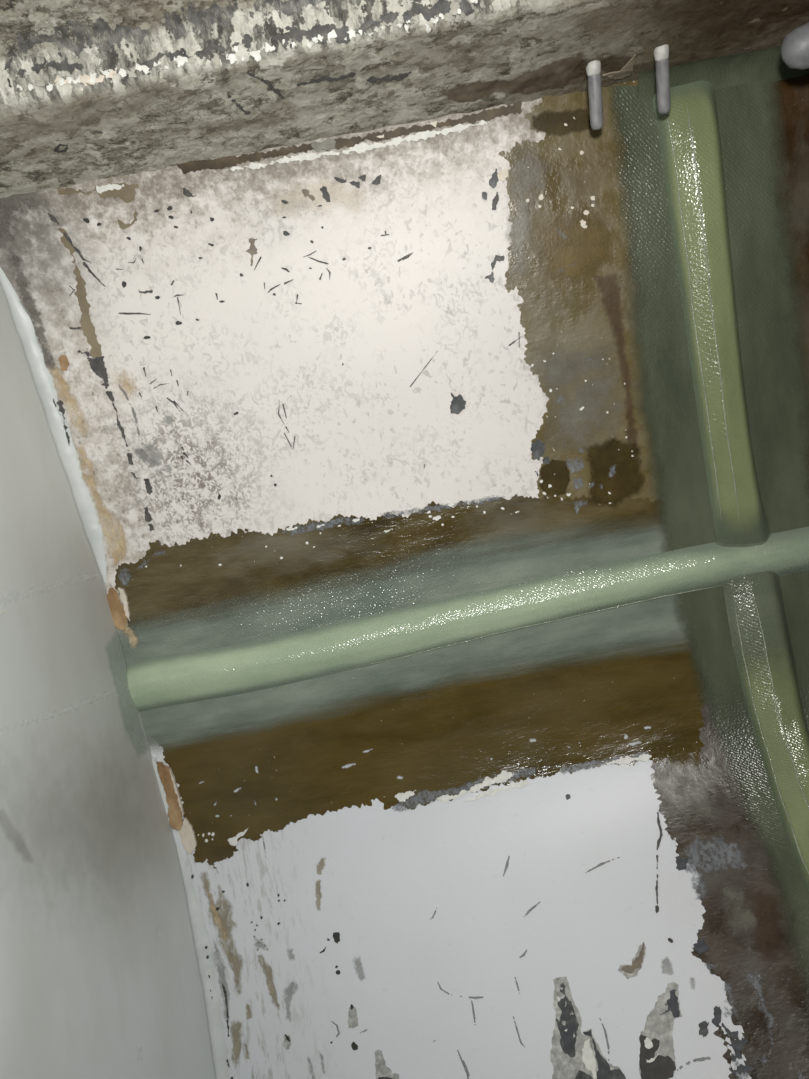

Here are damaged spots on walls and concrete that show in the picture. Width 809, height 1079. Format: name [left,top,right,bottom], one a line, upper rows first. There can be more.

leakage [442,53,588,102]
leakage [10,256,86,435]
leakage [79,448,126,565]
peeling [158,639,809,1079]